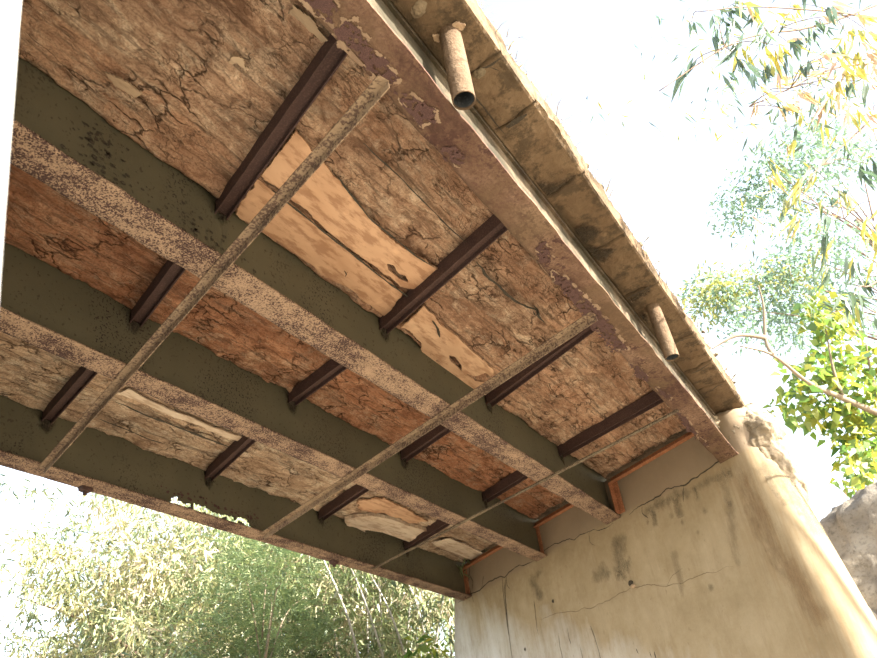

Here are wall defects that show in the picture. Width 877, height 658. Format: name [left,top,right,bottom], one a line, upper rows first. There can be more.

corrosion [299,0,441,129]
peeling [236,130,313,223]
peeling [262,162,438,316]
corrosion [535,241,630,352]
peeling [401,305,494,389]
peeling [117,388,242,441]
peeling [344,512,427,542]
peeling [431,538,483,560]
crack [459,461,733,655]